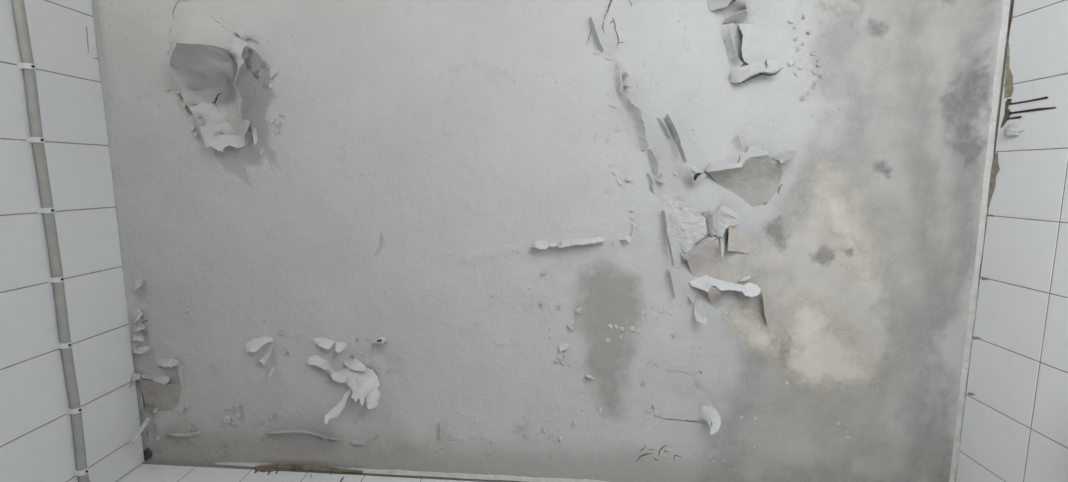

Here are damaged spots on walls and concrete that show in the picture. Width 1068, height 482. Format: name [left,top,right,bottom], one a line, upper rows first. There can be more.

peeling [163,0,279,155]
crack [586,0,634,51]
peeling [707,0,824,101]
leakage [1004,44,1013,98]
corrosion [1001,96,1056,127]
peeling [529,207,638,253]
peeling [589,17,798,342]
leakage [722,0,985,482]
leakage [987,153,999,207]
leakage [589,274,632,403]
spalling [129,358,201,460]
peeling [249,337,391,445]